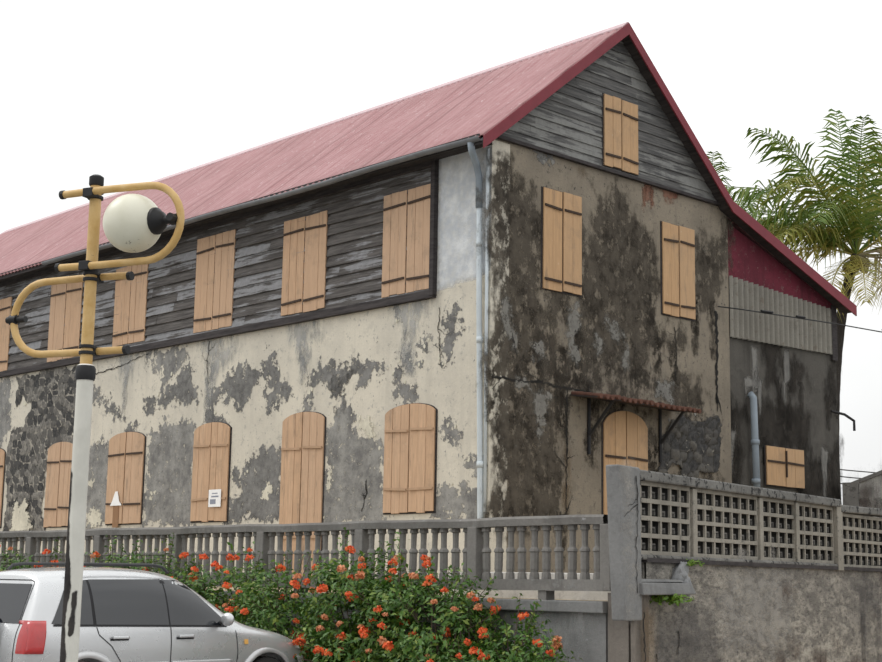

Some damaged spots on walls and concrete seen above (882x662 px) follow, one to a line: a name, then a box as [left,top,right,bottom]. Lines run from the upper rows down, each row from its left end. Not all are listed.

spalling [0,365,77,531]
peeling [86,434,109,529]
peeling [92,302,464,528]
peeling [429,453,488,531]
leakage [476,152,734,568]
crack [624,476,639,592]
leakage [703,343,843,504]
crack [643,612,658,662]